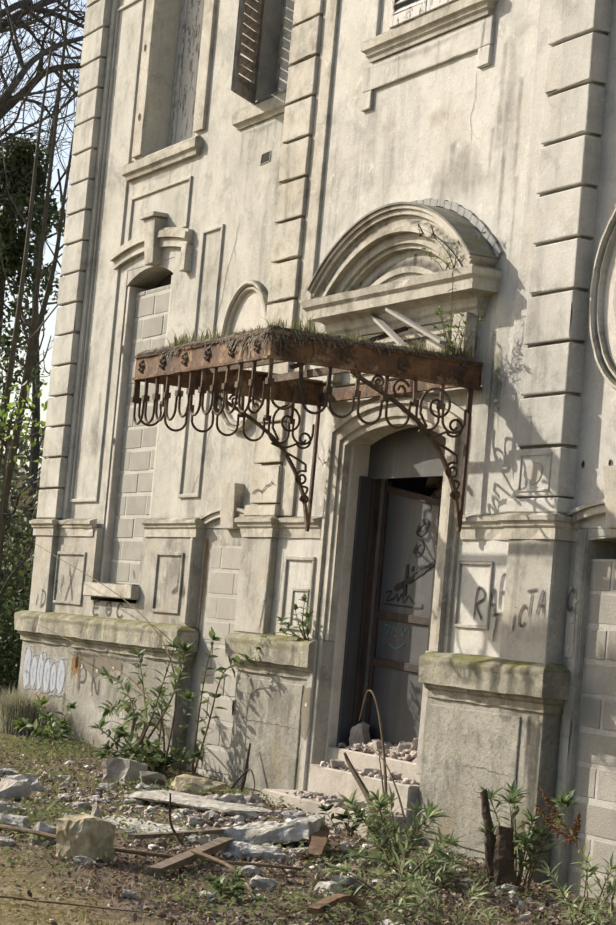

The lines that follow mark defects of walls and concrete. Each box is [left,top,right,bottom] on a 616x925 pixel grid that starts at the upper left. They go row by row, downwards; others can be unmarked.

rust [198,539,209,630]